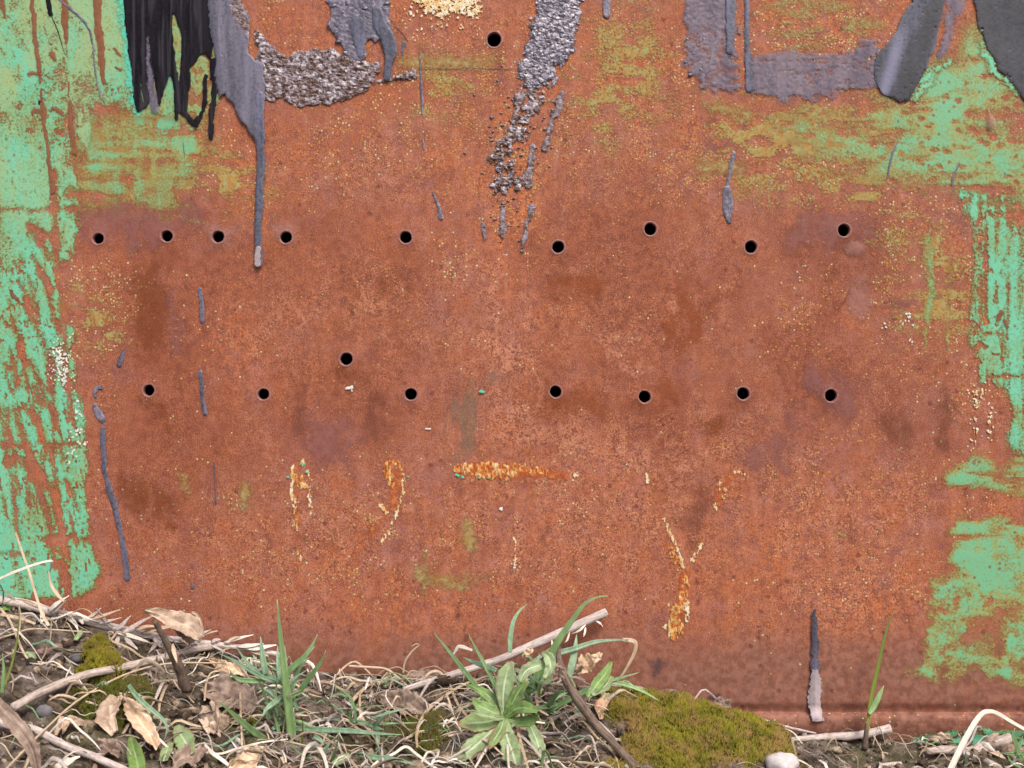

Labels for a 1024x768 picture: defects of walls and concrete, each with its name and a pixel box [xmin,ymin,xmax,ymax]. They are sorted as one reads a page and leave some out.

corrosion [93,0,122,85]
peeling [0,0,221,600]
peeling [771,22,1024,497]
peeling [905,515,1024,687]